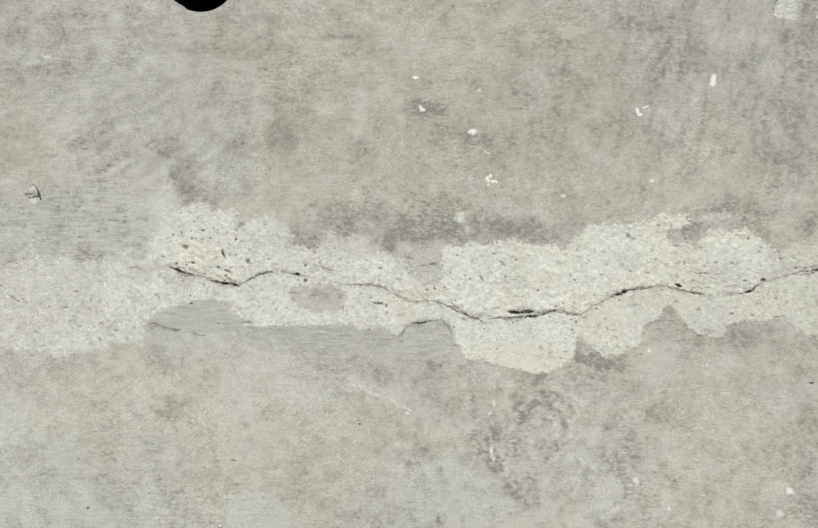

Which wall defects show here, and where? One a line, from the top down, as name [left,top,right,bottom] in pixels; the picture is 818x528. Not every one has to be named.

spalling [0,207,818,376]
crack [166,264,818,343]